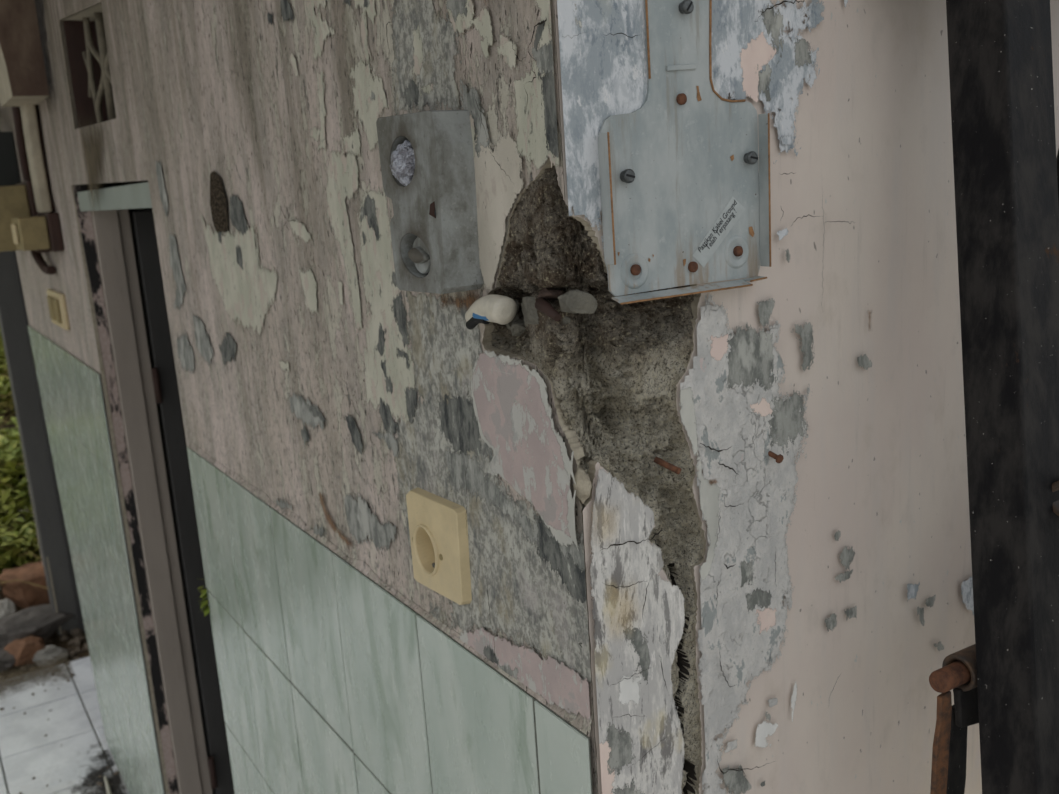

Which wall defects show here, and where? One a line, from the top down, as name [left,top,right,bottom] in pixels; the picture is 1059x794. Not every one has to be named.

peeling [267,0,294,25]
peeling [169,235,187,311]
peeling [177,170,280,375]
peeling [299,269,317,314]
peeling [857,354,872,370]
spalling [306,0,825,794]
crack [700,443,737,474]
peeling [834,530,855,583]
peeling [825,606,857,632]
peeling [907,582,936,626]
peeling [961,577,974,615]
crack [603,501,770,794]